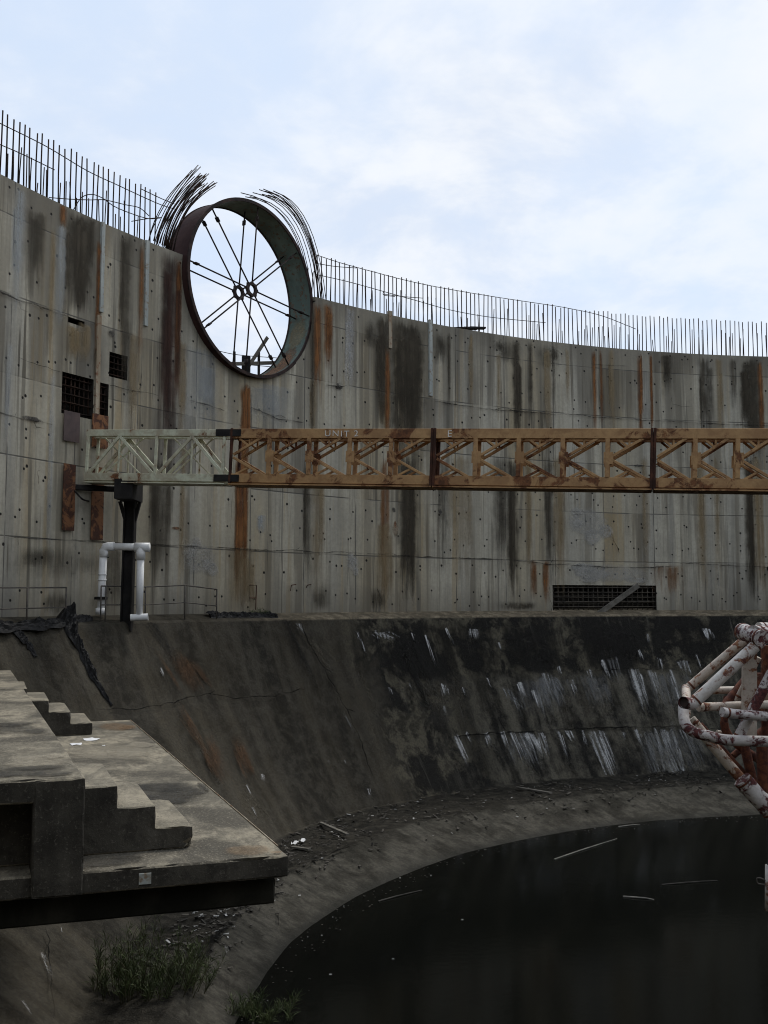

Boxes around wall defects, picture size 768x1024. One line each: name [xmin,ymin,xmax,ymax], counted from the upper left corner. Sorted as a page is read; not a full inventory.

water stain [35,216,94,321]
corrosion [314,305,332,382]
corrosion [241,386,251,429]
water stain [501,344,554,429]
corrosion [592,353,603,422]
corrosion [638,357,653,428]
water stain [700,360,760,428]
corrosion [235,487,248,582]
water stain [401,490,416,578]
water stain [499,491,530,583]
crack [458,720,534,737]
crack [568,723,676,731]